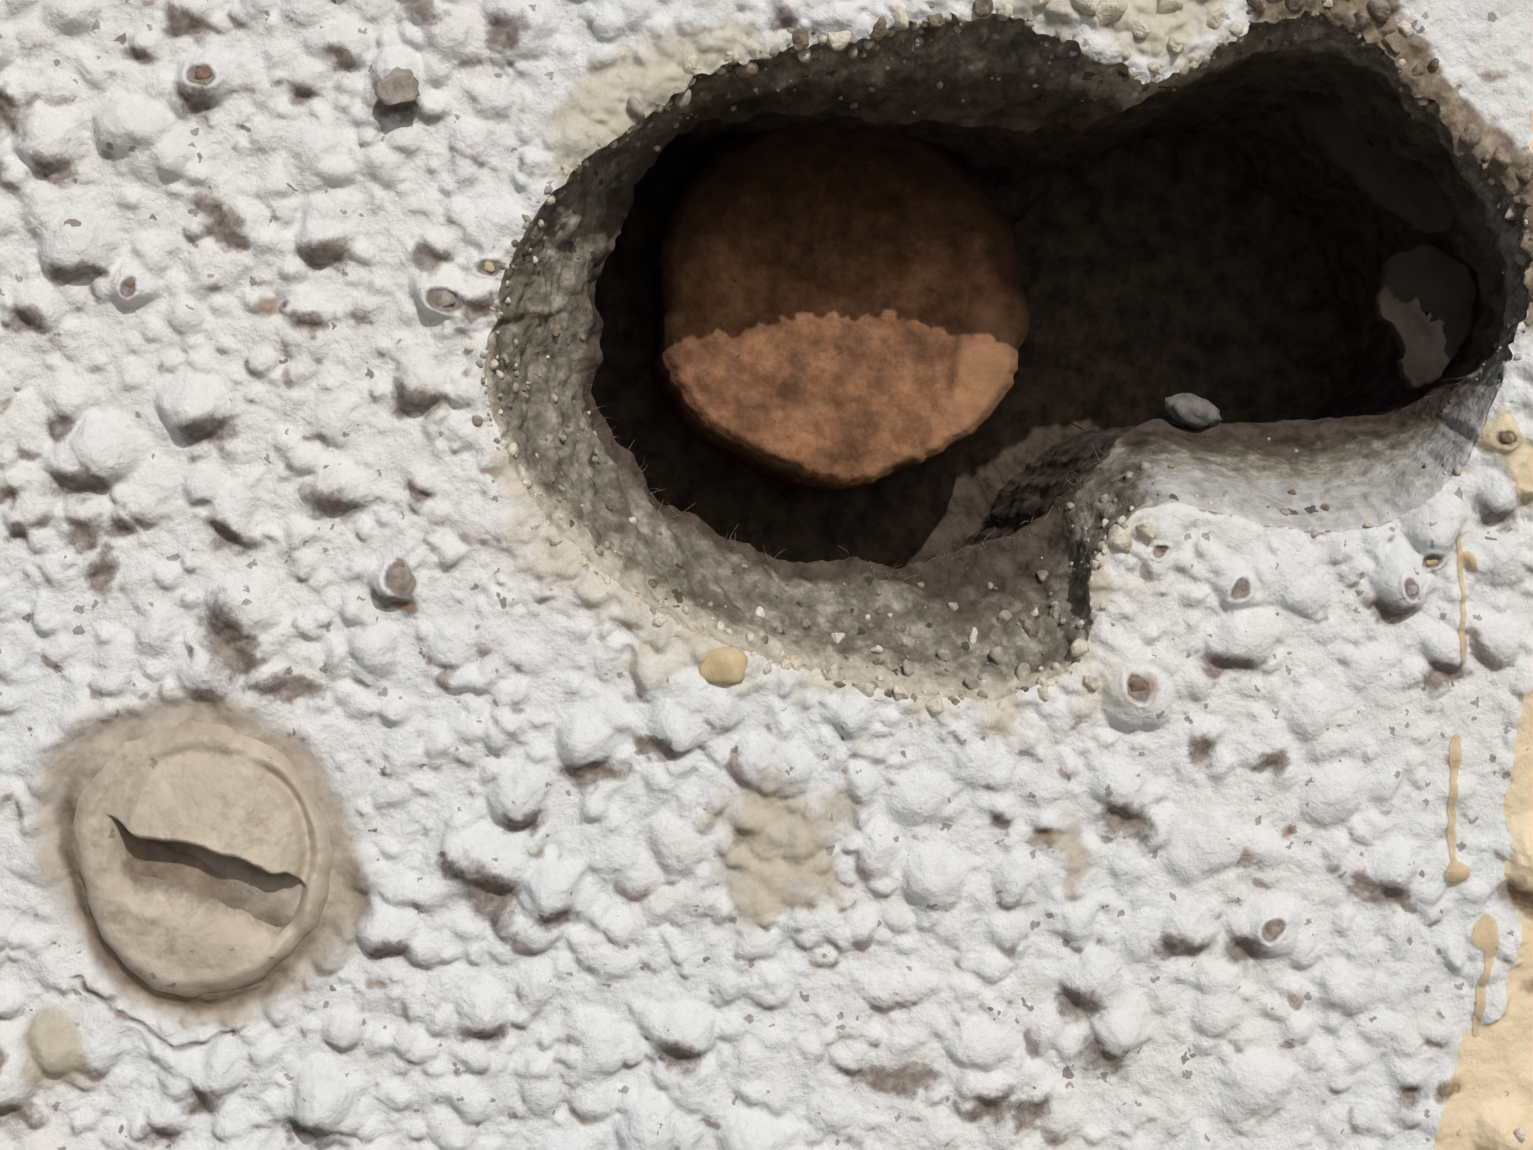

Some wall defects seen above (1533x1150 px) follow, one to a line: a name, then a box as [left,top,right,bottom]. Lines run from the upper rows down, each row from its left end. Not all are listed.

peeling [413,243,451,271]
spalling [427,0,1533,716]